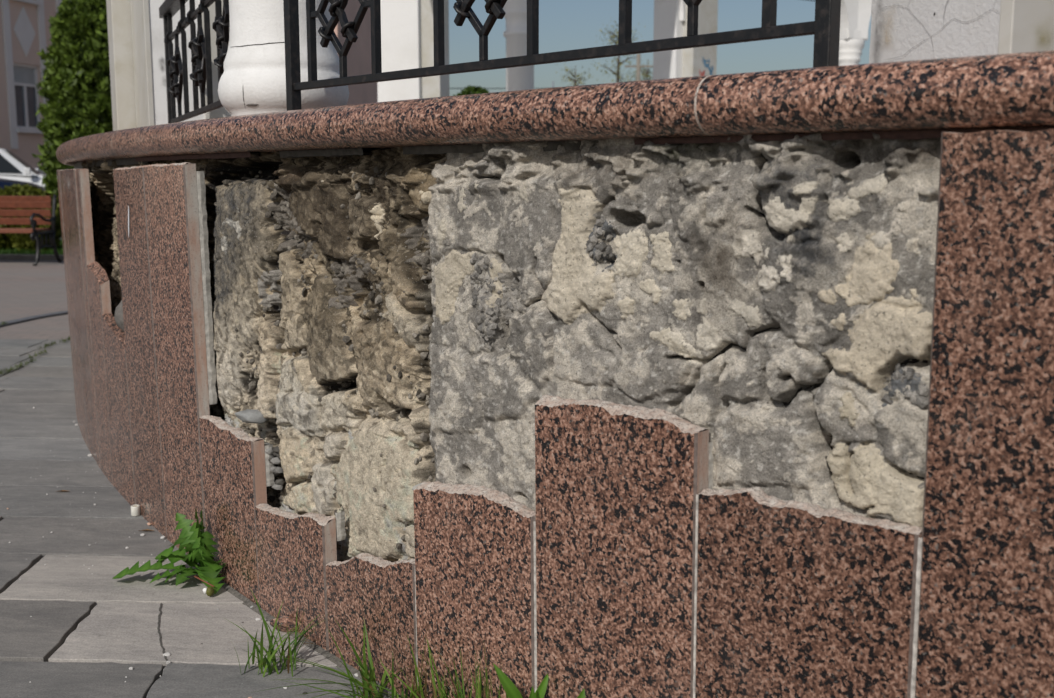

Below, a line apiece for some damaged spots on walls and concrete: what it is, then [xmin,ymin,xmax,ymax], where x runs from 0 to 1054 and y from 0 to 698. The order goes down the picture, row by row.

flaking render [220,208,242,255]
flaking render [368,202,385,240]
spalling [87,261,109,285]
flaking render [396,187,729,365]
flaking render [727,173,933,407]
spalling [199,415,264,441]
spalling [535,394,706,434]
spalling [255,473,335,526]
spalling [414,481,536,518]
flaking render [698,442,925,535]
spalling [326,553,415,568]
crack [157,603,168,661]